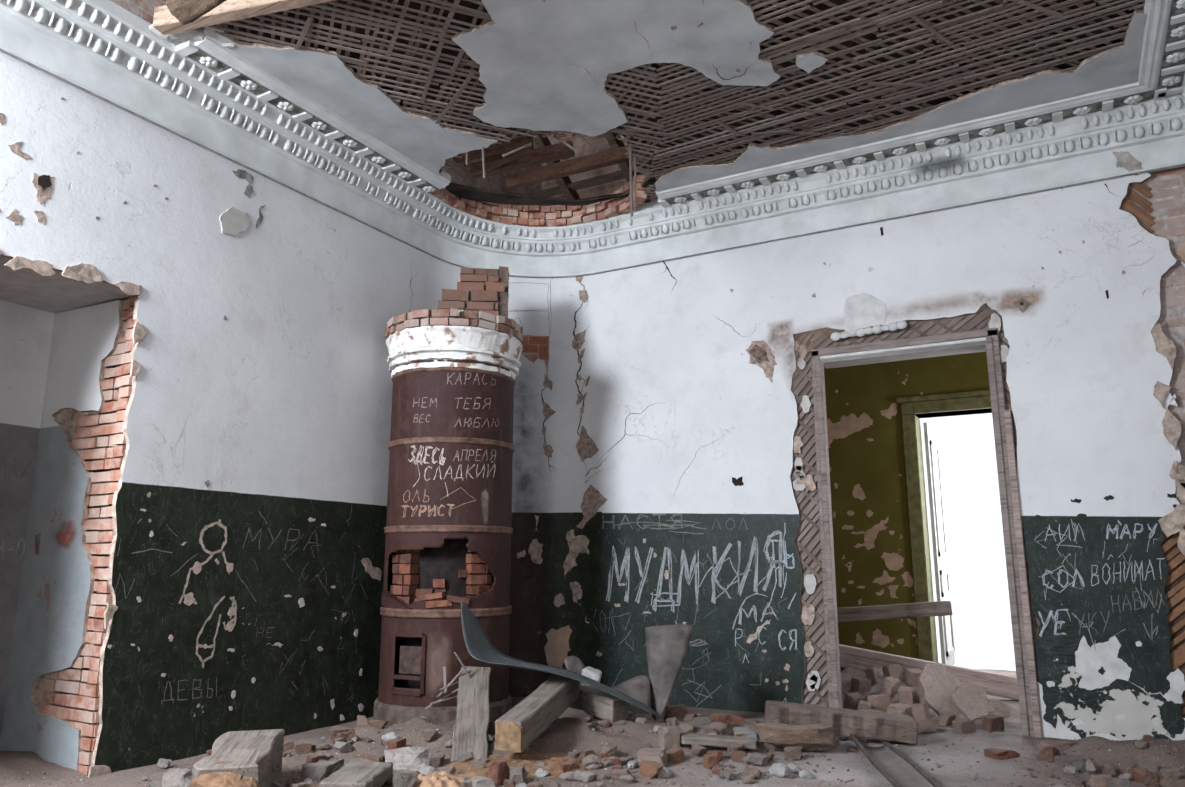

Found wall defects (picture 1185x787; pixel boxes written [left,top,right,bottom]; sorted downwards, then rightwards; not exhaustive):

flaking render [149,0,1145,237]
crack [509,276,666,529]
flaking render [746,340,777,383]
flaking render [1013,296,1031,313]
flaking render [0,251,147,778]
flaking render [791,304,1017,707]
flaking render [1021,515,1043,649]
peeling [1036,681,1123,752]
peeling [1075,636,1132,690]